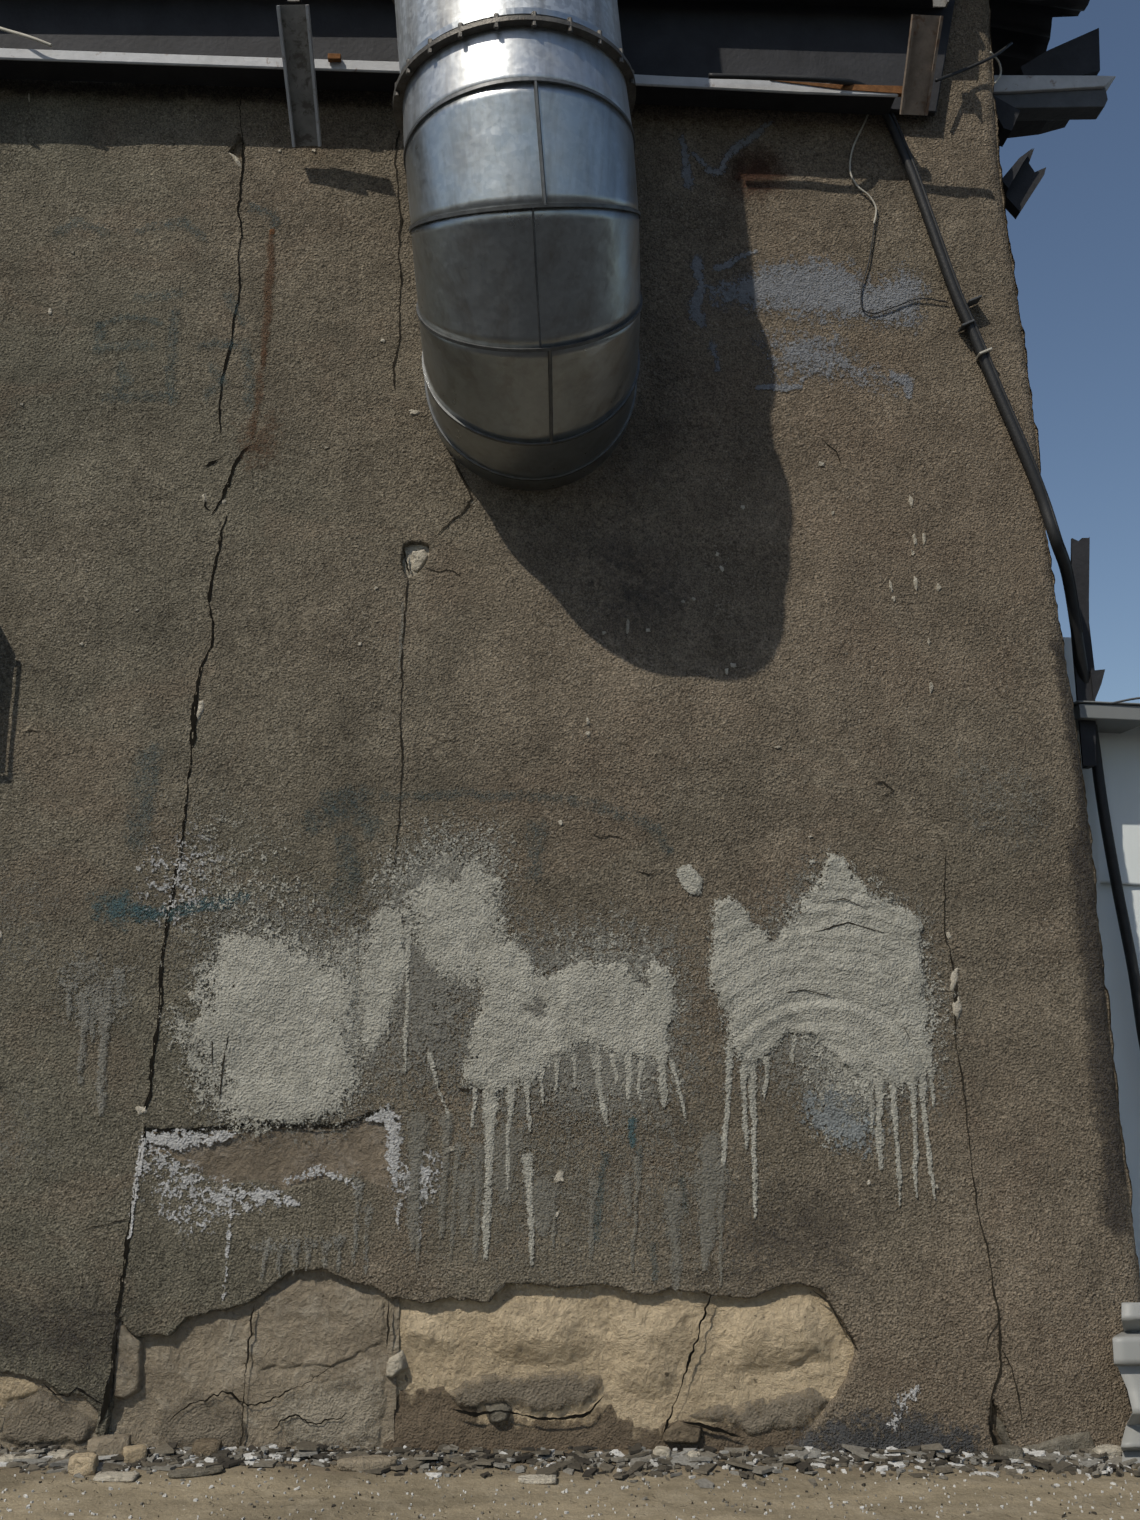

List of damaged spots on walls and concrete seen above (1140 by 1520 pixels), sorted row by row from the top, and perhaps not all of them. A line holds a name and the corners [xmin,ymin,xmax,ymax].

crack [392,130,403,389]
flaking render [402,545,459,578]
crack [84,99,252,1426]
crack [392,457,473,910]
leakage [221,1193,233,1301]
leakage [249,1171,373,1282]
crack [944,856,1022,1446]
flaking render [0,1269,854,1465]
flaking render [518,1474,556,1484]